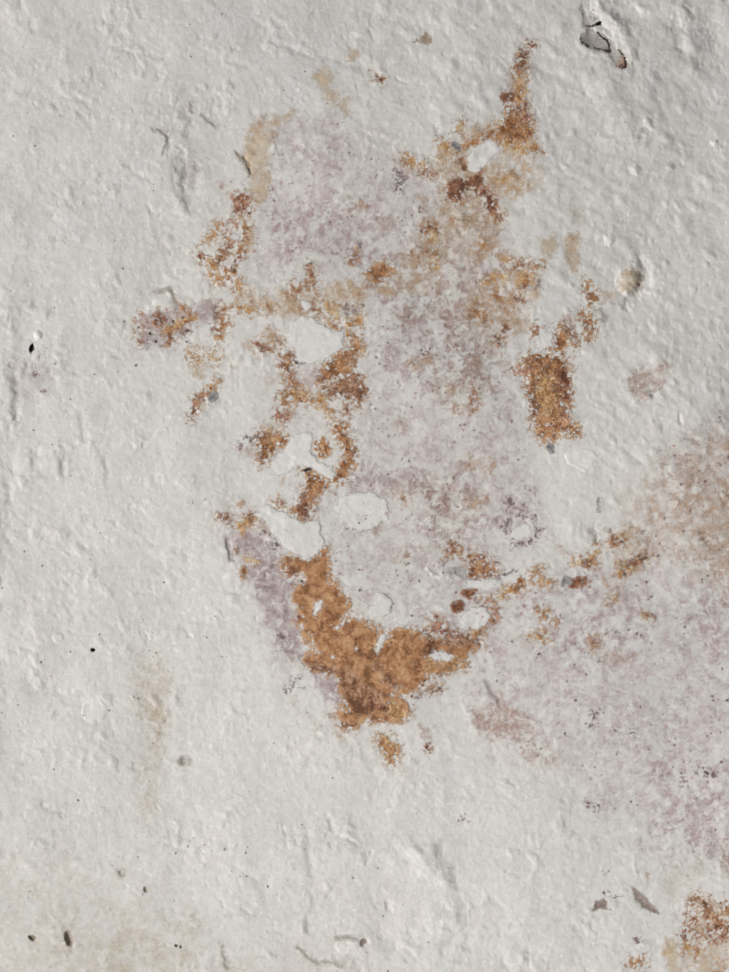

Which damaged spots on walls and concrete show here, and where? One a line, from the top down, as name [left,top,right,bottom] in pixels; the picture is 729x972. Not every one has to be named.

spalling [580,1,628,69]
corrosion [399,39,601,454]
corrosion [133,114,400,523]
corrosion [216,500,266,536]
corrosion [233,548,261,579]
corrosion [275,528,653,767]
corrosion [663,890,729,972]